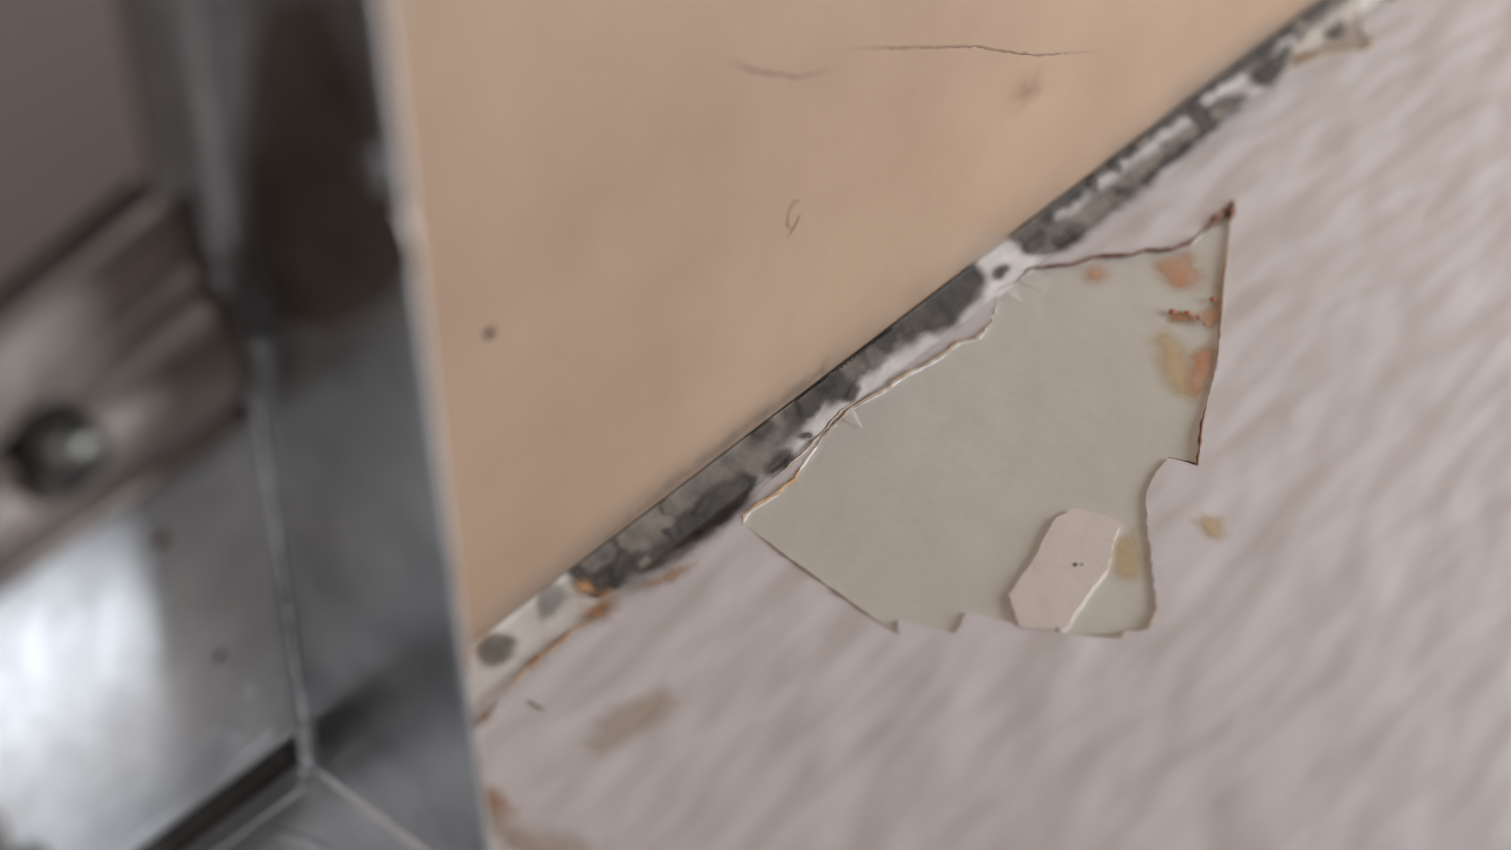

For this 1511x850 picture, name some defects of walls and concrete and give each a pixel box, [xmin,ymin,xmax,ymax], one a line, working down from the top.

mould [1012,0,1345,254]
damp [572,263,1010,594]
peeling [741,200,1236,638]
mould [480,635,515,665]
peeling [466,572,632,727]
mould [541,584,565,616]